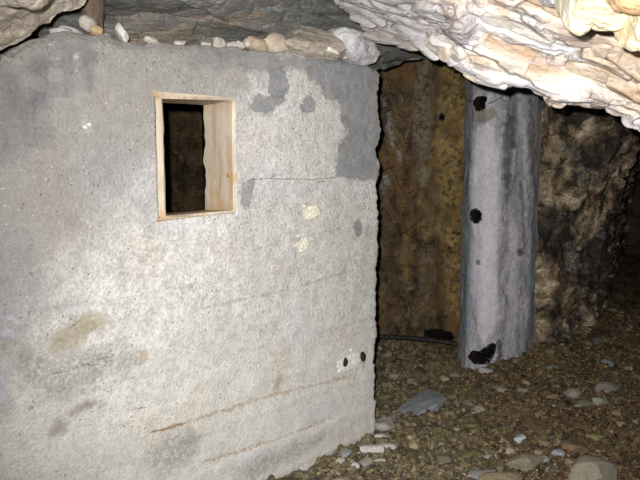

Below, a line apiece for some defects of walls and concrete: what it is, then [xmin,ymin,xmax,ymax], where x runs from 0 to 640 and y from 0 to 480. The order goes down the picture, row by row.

spalling [473,95,488,112]
damp [189,54,379,181]
spalling [470,208,483,224]
spalling [468,341,497,365]
rust [152,390,291,432]